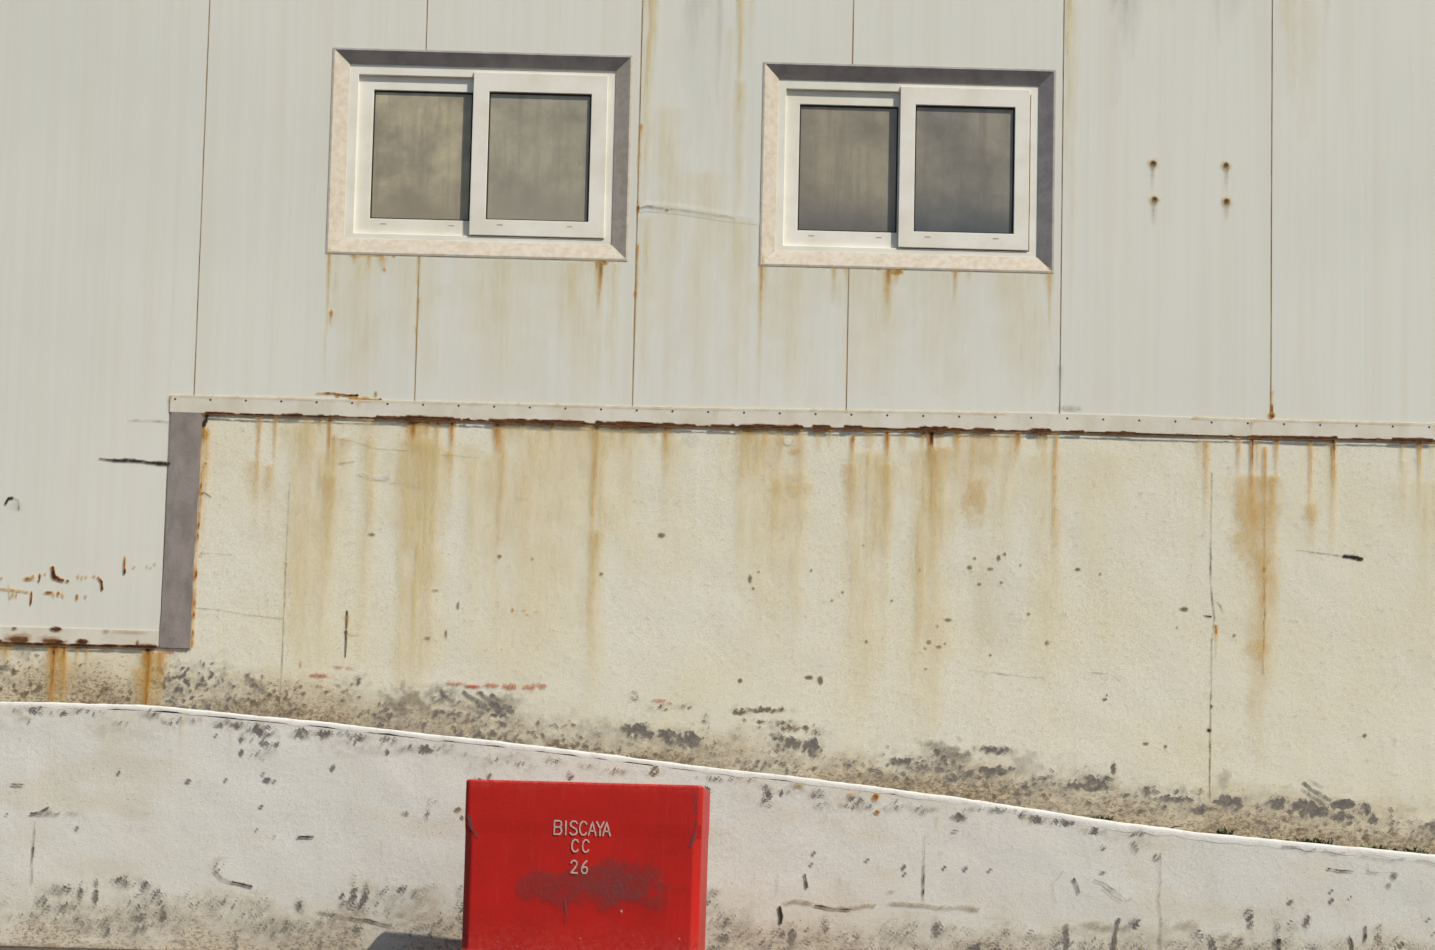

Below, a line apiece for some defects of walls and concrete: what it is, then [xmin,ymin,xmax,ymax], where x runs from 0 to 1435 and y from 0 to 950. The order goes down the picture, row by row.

corrosion [596,260,607,288]
corrosion [877,269,903,284]
corrosion [191,391,1435,648]
corrosion [0,566,103,605]
corrosion [0,626,164,705]
damp [439,688,515,715]
damp [1303,782,1332,806]